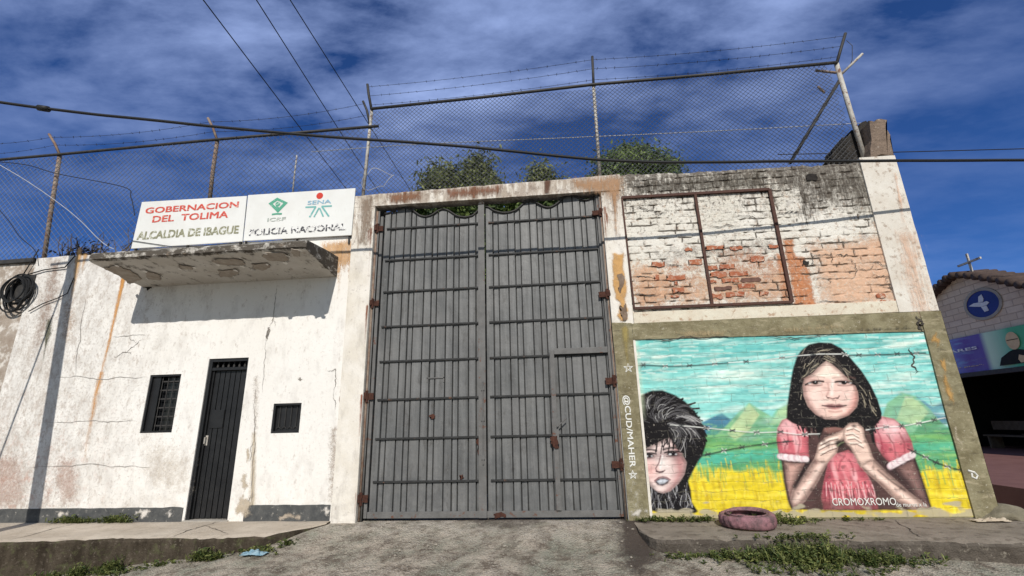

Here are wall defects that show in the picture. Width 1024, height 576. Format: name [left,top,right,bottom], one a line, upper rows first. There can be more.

damp [574,173,764,228]
damp [779,171,870,220]
peeling [104,265,163,291]
peeling [212,248,304,278]
peeling [613,238,896,321]
crack [58,307,143,380]
corrosion [105,279,125,357]
crack [44,417,132,425]